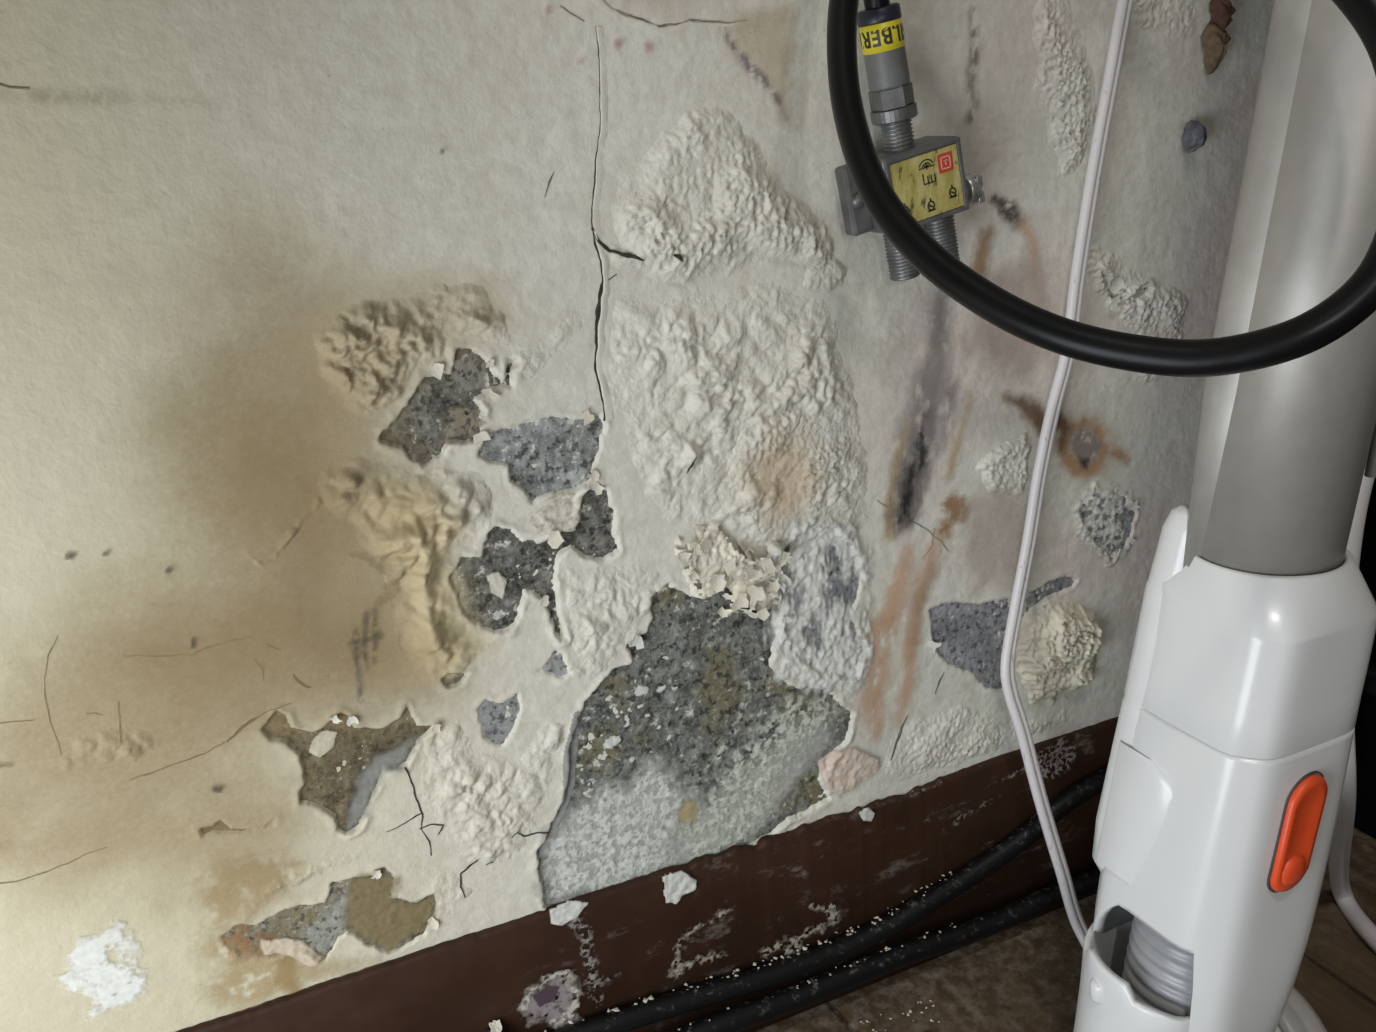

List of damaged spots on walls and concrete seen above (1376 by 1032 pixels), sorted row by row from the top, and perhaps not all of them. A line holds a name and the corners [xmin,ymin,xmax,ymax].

crack [560,0,747,421]
peeling [263,708,441,831]
water stain [355,480,478,678]
peeling [379,348,617,676]
peeling [537,516,880,905]
rust [864,549,934,734]
rust [939,496,968,534]
peeling [928,576,1074,690]
rust [1004,395,1126,476]
peeling [221,867,439,994]